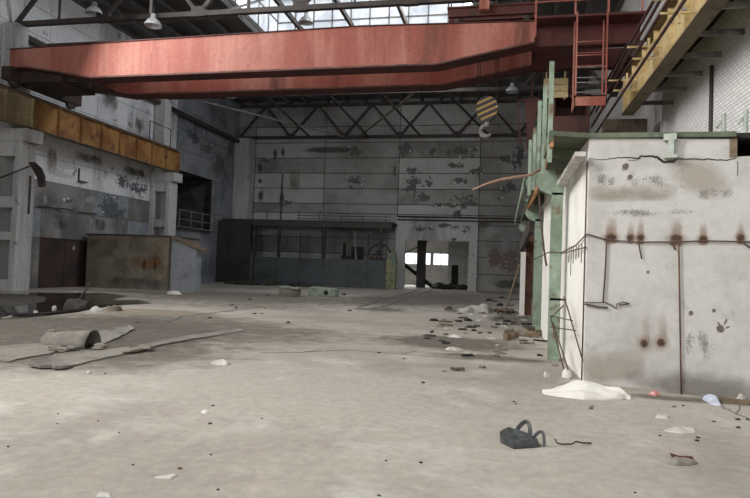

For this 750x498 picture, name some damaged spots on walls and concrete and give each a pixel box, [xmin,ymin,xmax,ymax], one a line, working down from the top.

peeling [393,142,484,241]
crack [595,155,738,176]